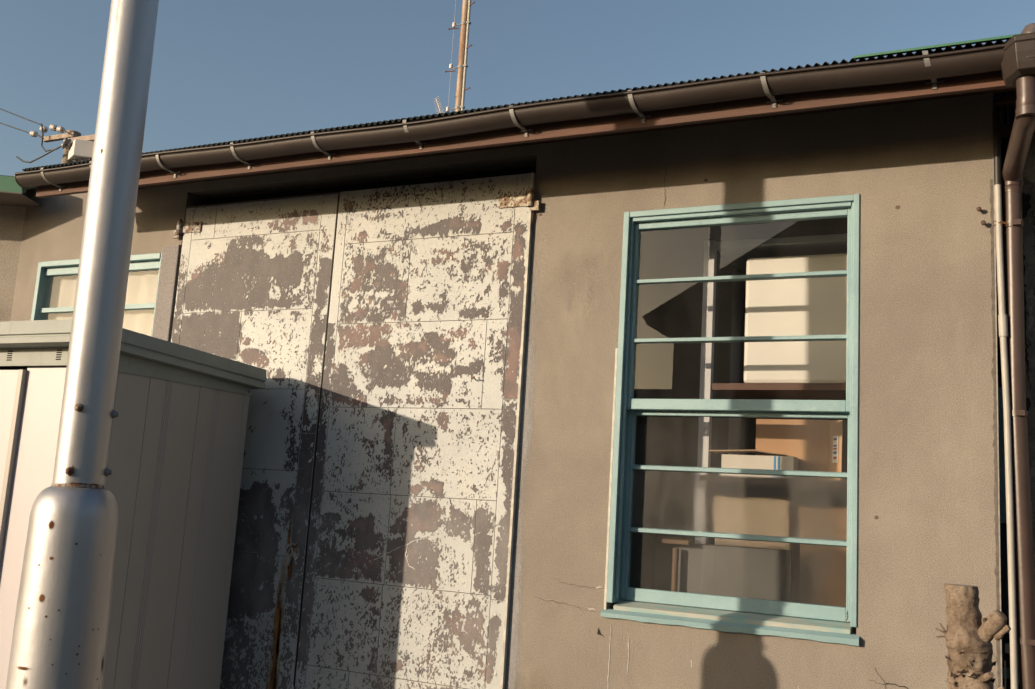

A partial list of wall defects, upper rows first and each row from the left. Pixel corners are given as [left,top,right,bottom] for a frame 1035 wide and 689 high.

peeling [171,176,542,689]
corrosion [268,527,292,689]
crack [537,578,602,613]